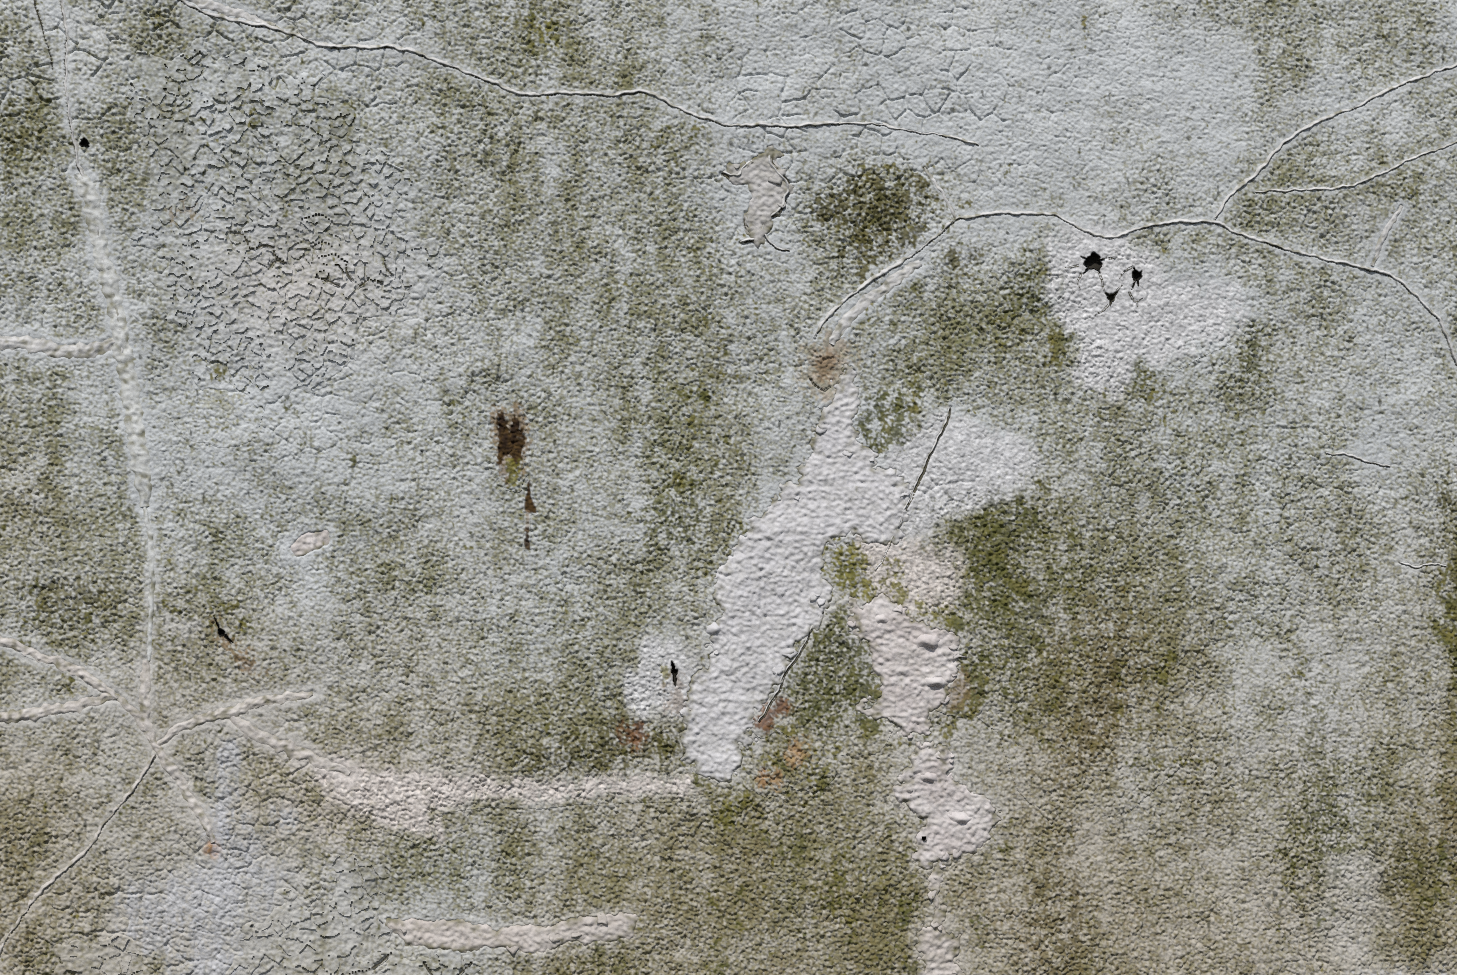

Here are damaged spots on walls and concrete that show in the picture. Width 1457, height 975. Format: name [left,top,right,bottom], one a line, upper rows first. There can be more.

peeling [727,145,794,249]
crack [813,63,1457,366]
damp [0,808,53,975]
crack [0,0,979,975]
corrosion [487,399,538,550]
peeling [679,321,1043,975]
damp [973,548,1197,975]
damp [1254,664,1379,956]
crack [1326,452,1390,467]
crack [1399,561,1447,569]
damp [1419,459,1457,740]